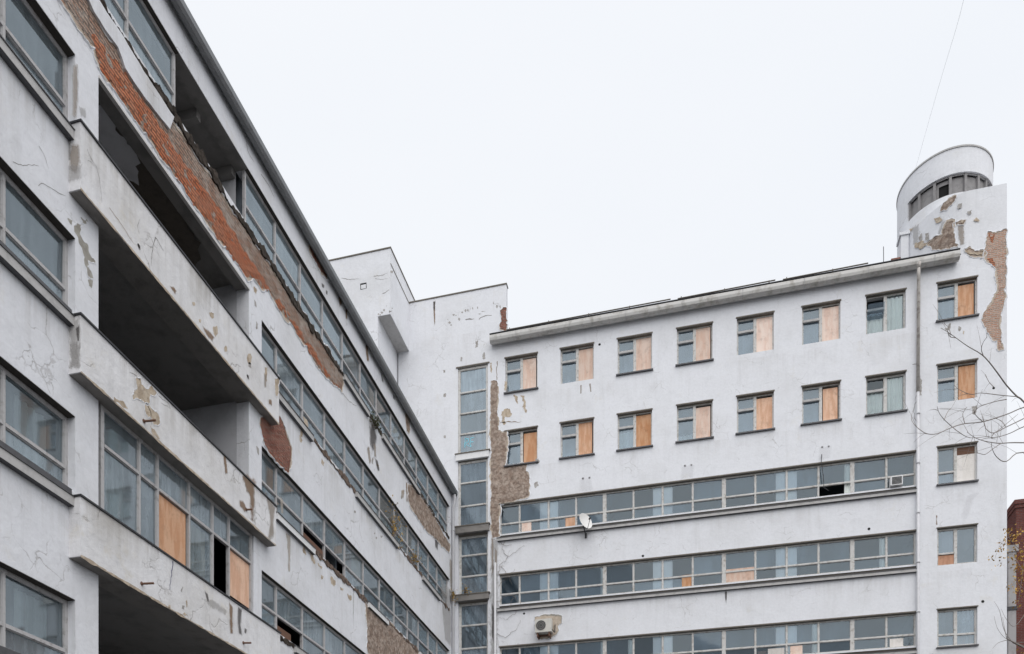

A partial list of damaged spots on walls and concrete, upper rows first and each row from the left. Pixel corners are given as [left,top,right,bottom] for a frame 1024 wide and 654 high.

spalling [80,187,308,474]
spalling [58,0,345,395]
spalling [447,302,508,331]
spalling [909,194,1009,352]
peeling [81,371,276,546]
spalling [401,483,451,553]
spalling [475,341,540,539]
spalling [364,602,419,654]